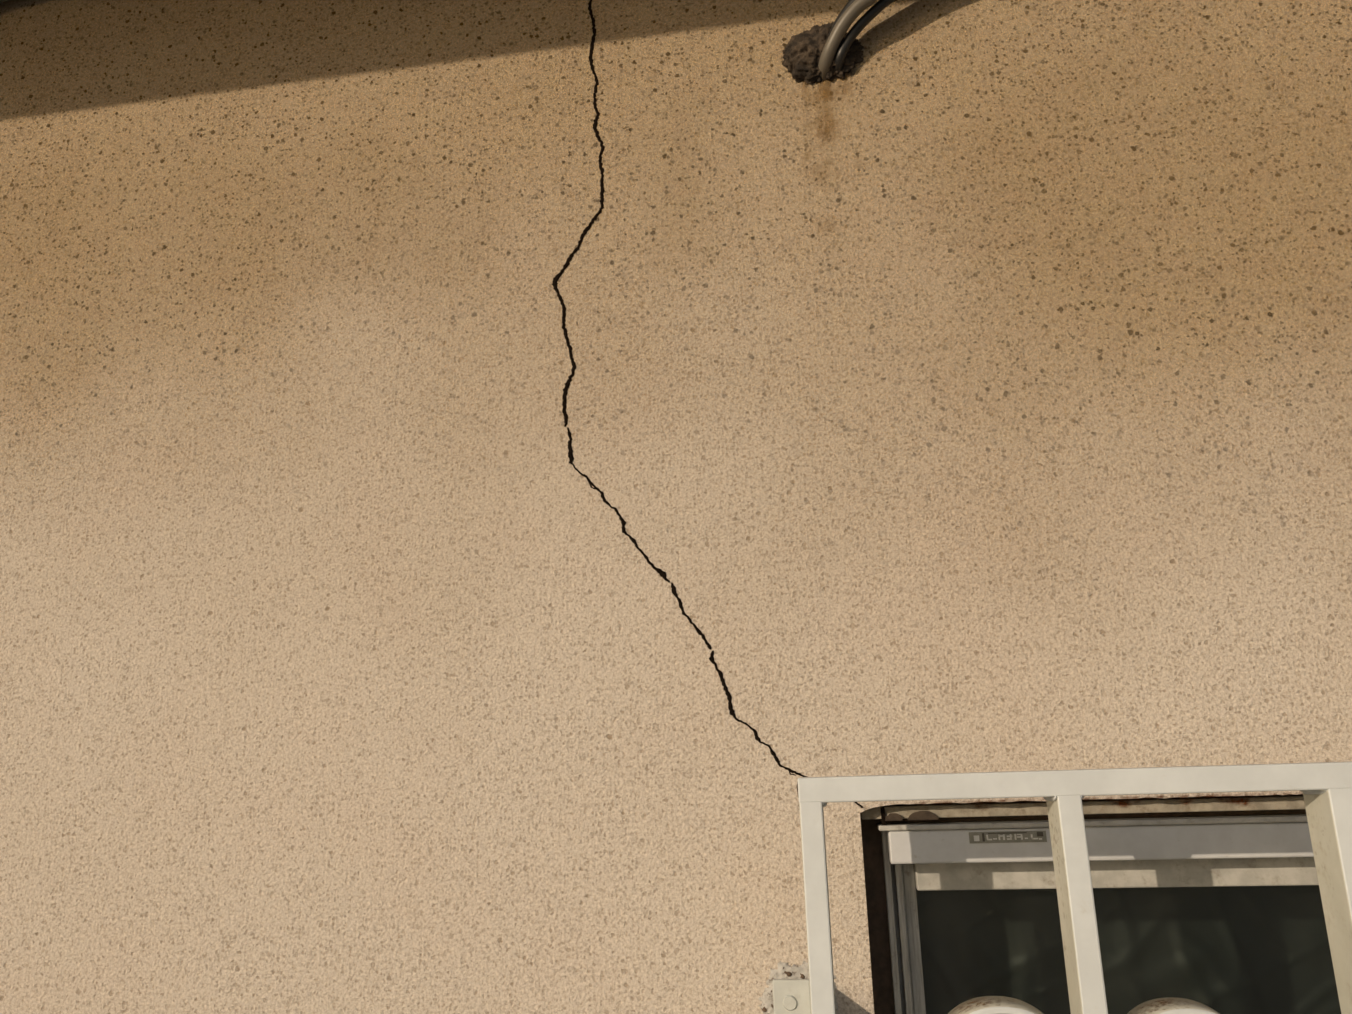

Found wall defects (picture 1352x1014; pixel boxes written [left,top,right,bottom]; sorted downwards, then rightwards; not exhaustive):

crack [552,0,807,777]